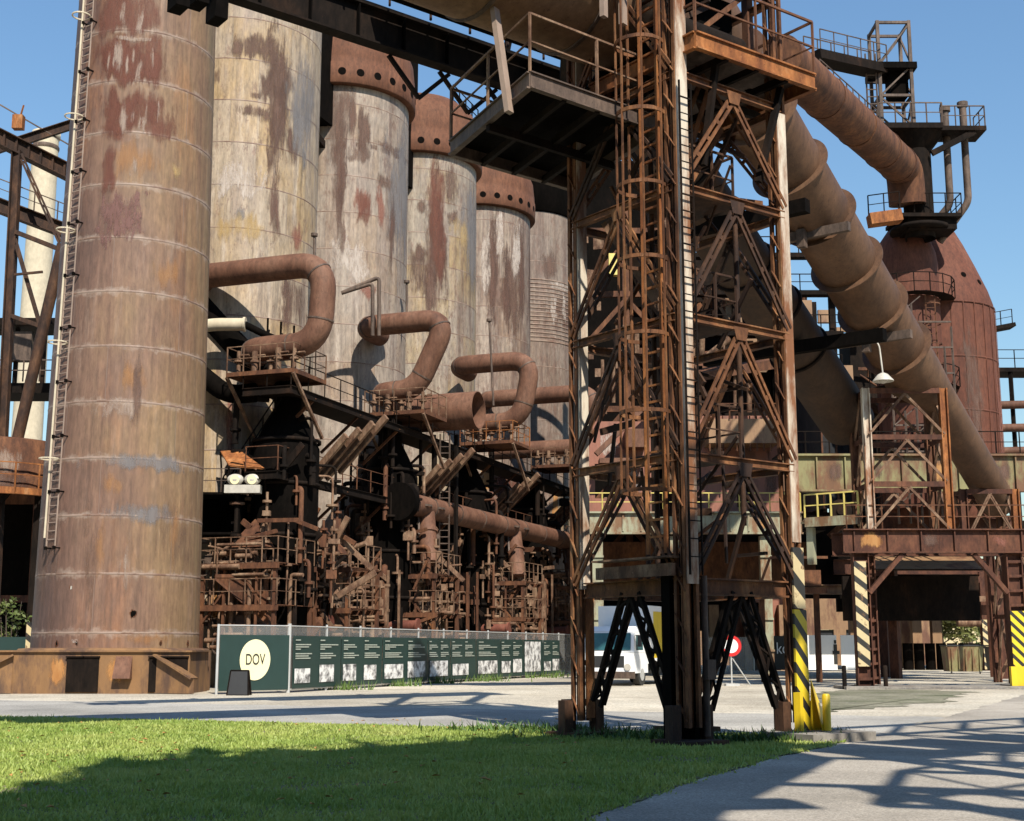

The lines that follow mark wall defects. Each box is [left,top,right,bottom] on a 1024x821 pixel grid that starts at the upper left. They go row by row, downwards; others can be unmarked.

corrosion [102,146,151,191]
corrosion [129,366,141,417]
corrosion [861,532,880,547]
corrosion [52,659,65,684]